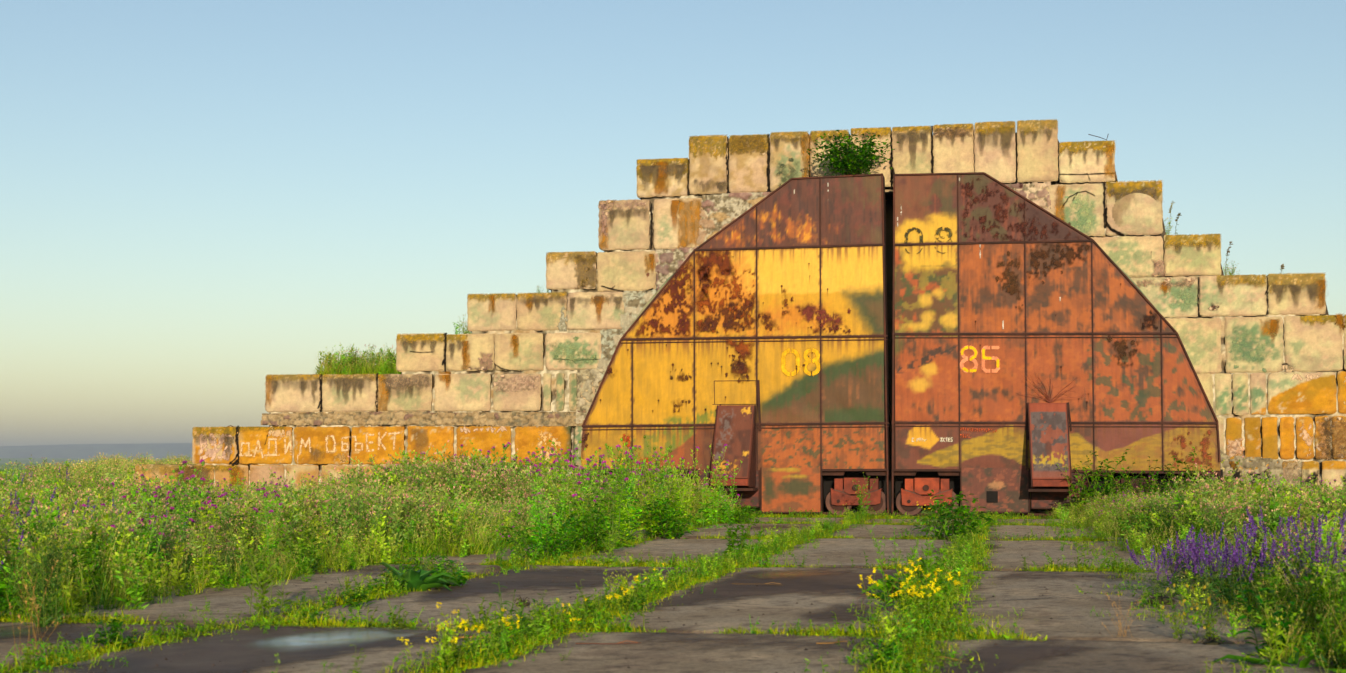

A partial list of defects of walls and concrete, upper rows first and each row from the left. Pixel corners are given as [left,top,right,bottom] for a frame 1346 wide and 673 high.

damp [641,163,727,189]
damp [609,209,646,223]
rust [962,178,1090,308]
rust [627,162,851,382]
rust [1108,311,1158,366]
damp [301,378,371,397]